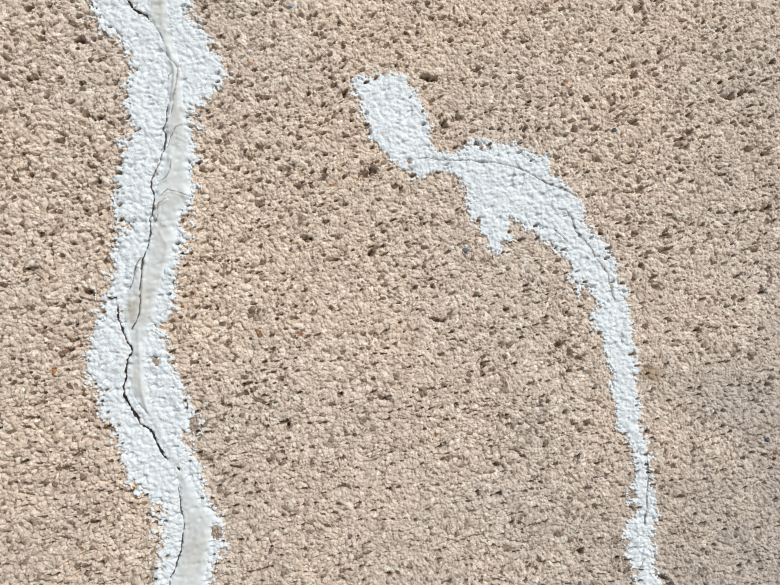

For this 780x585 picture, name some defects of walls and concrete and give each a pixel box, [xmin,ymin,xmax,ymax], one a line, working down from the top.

crack [107,1,187,585]